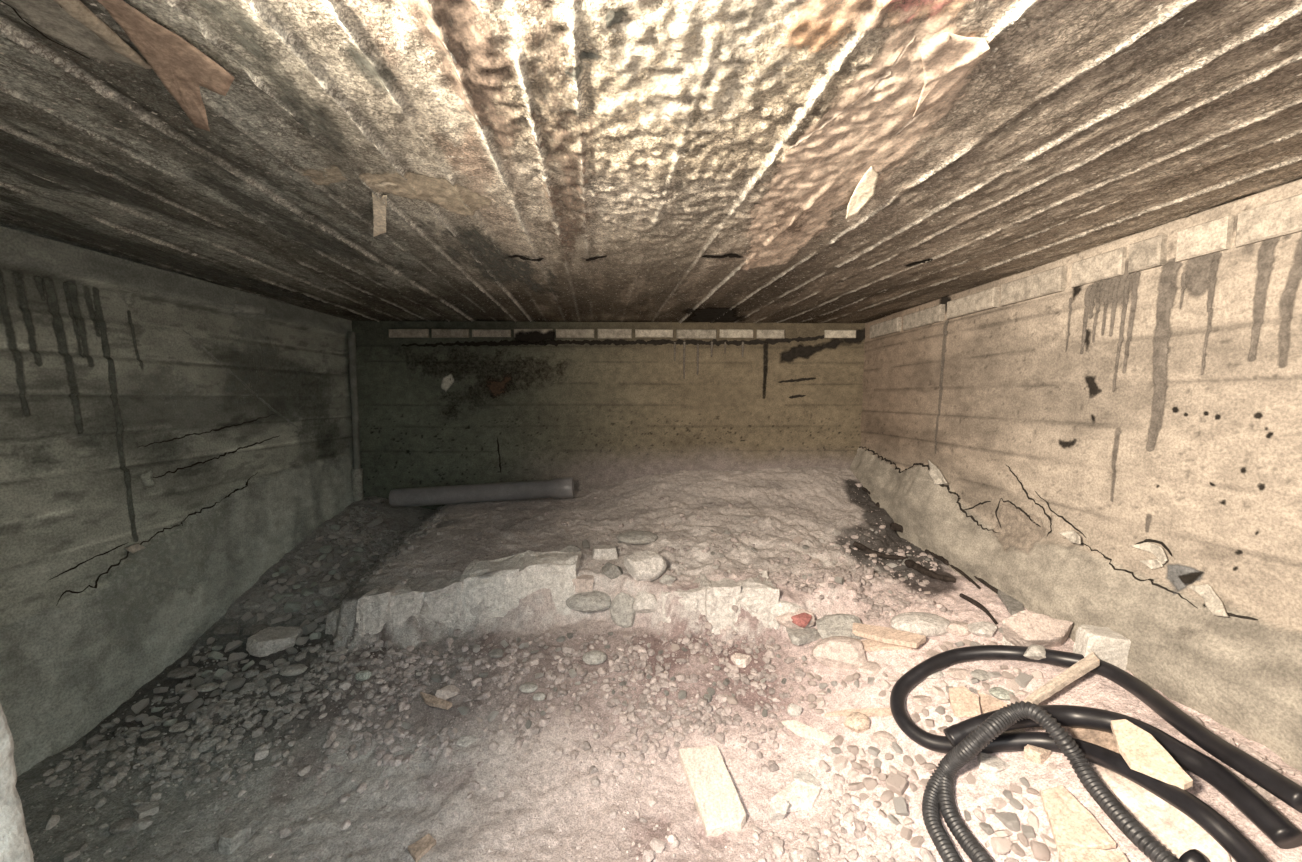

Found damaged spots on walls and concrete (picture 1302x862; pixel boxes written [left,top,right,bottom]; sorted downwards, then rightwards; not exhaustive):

peeling [0,0,149,71]
water stain [0,270,230,624]
crack [50,414,280,606]
water stain [0,194,337,458]
water stain [399,349,564,417]
water stain [1065,260,1140,392]
water stain [1146,253,1221,451]
water stain [1245,234,1302,367]